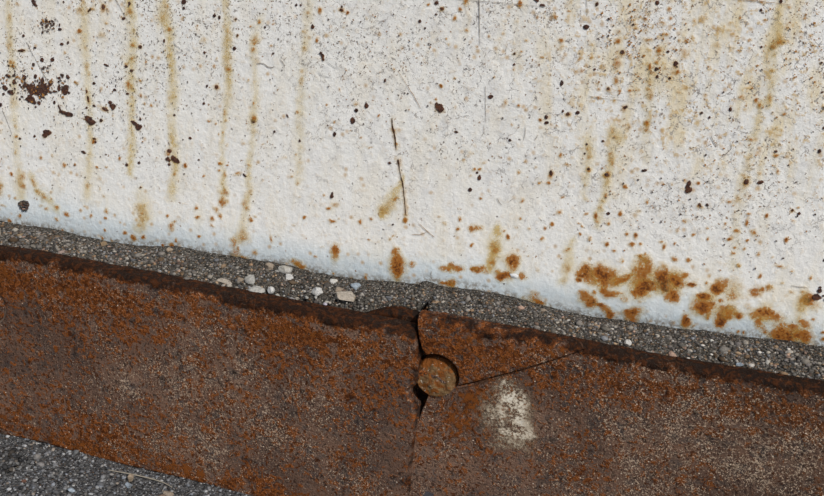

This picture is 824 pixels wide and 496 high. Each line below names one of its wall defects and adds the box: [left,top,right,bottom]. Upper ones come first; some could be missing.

rust [389,248,415,279]
rust [440,226,525,287]
rust [567,255,824,344]
crack [459,340,585,389]